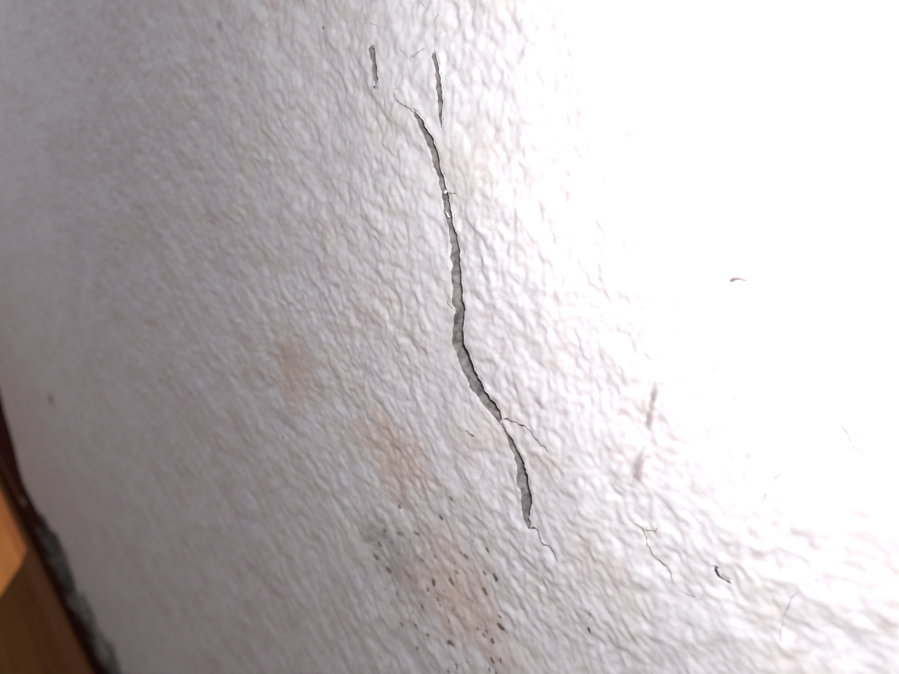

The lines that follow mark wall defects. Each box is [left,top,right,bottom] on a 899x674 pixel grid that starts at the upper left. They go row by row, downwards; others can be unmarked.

crack [362,0,557,560]
crack [630,519,713,606]